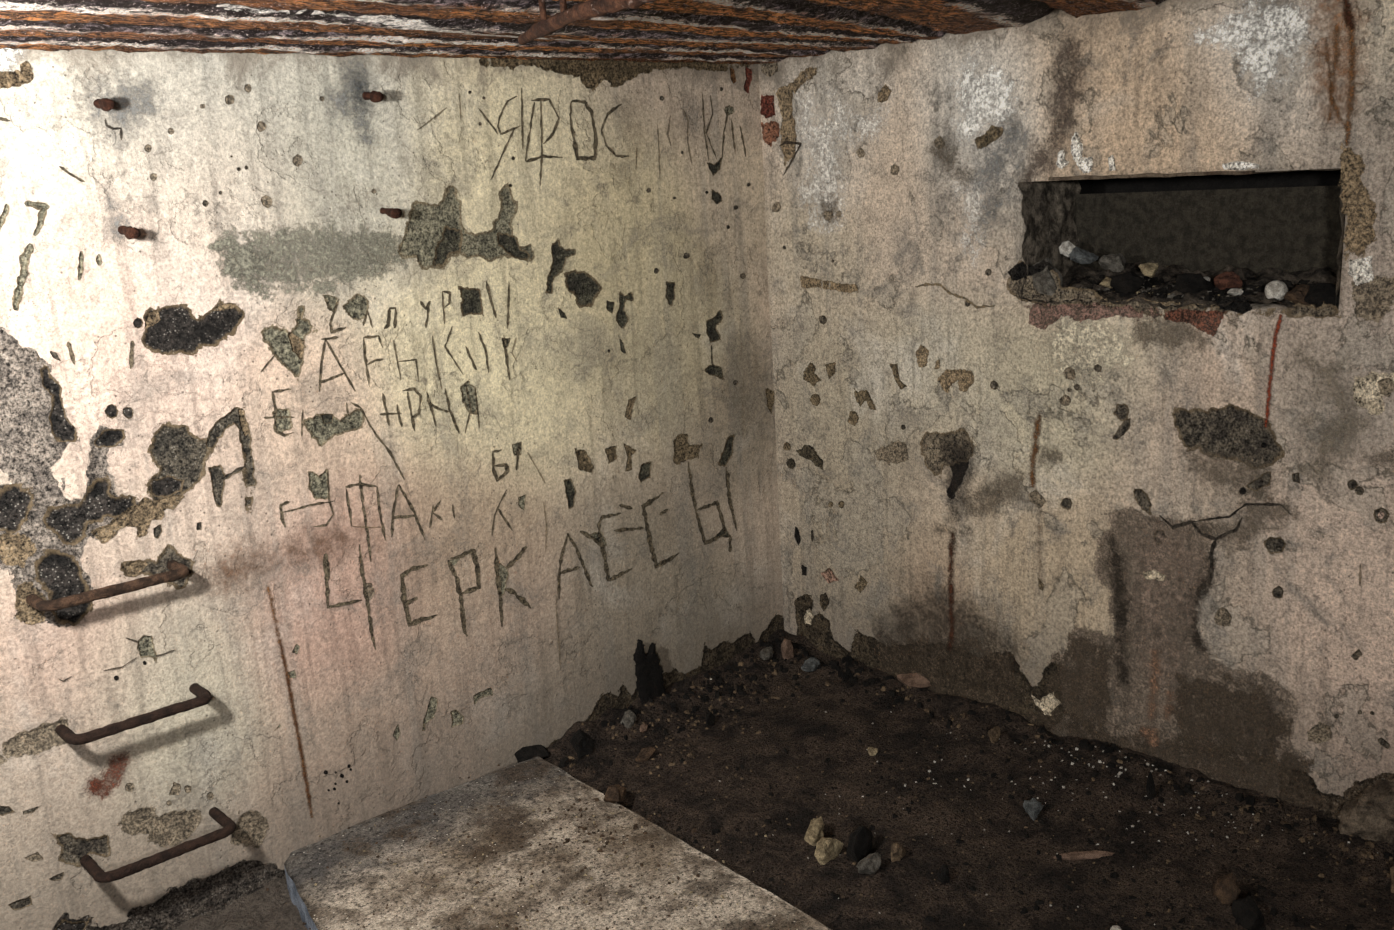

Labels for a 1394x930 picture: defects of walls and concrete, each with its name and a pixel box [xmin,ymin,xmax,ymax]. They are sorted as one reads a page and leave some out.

spalling [225,84,251,105]
spalling [705,157,738,229]
peeling [133,180,634,382]
peeling [654,268,675,307]
spalling [0,327,217,628]
peeling [874,424,975,479]
peeling [961,472,1024,516]
spalling [1171,403,1298,558]
crack [1159,502,1291,587]
damp [662,506,1394,820]
damp [584,682,639,722]